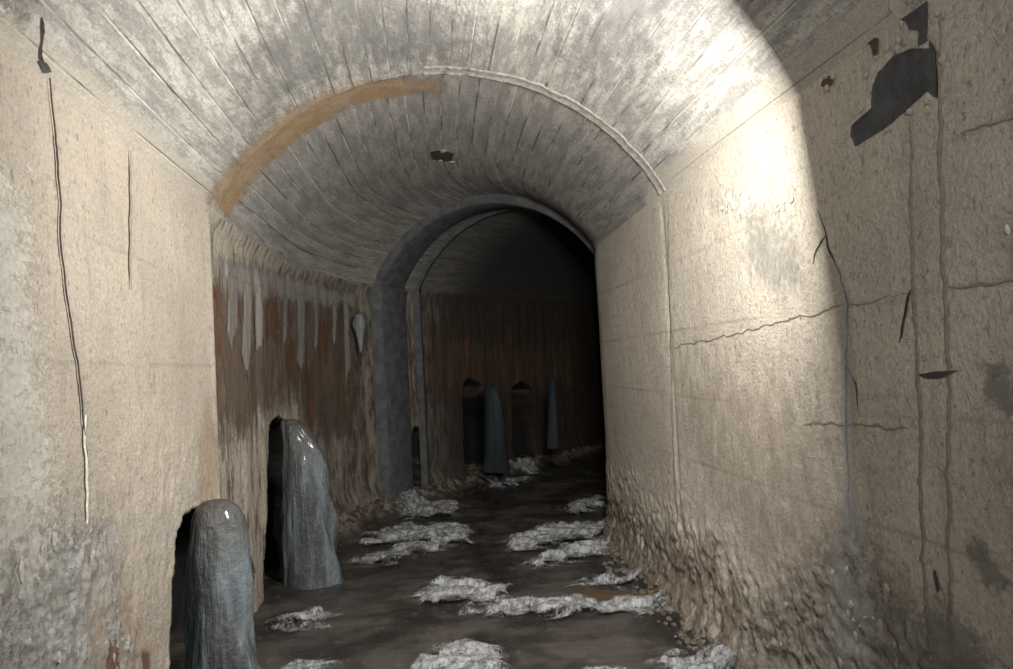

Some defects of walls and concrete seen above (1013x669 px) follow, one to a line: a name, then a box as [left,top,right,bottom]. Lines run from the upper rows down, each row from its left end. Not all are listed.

spalling [842,0,946,147]
crack [960,117,1013,135]
crack [39,18,89,523]
crack [949,278,1013,289]
rust [213,279,358,448]
crack [673,209,912,584]
damp [966,537,1013,601]